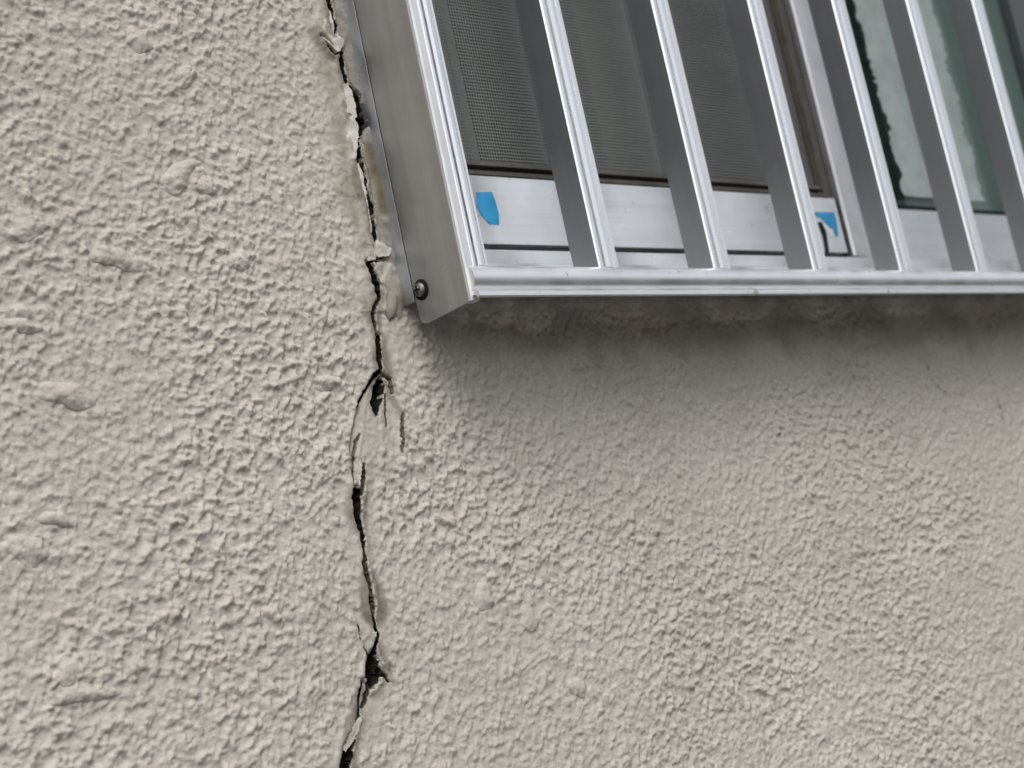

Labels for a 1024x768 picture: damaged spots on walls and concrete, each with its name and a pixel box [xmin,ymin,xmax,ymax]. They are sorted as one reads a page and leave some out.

peeling [321,10,344,54]
crack [312,0,405,452]
peeling [342,83,396,286]
spalling [350,373,406,492]
crack [339,435,389,768]
spalling [342,629,394,752]